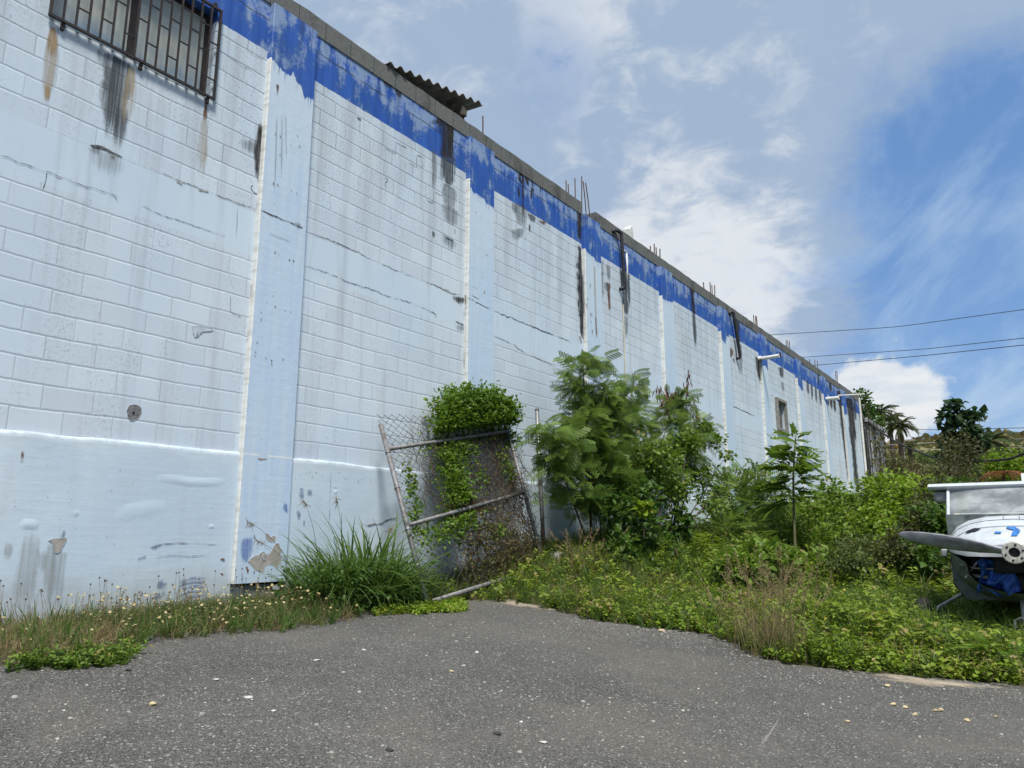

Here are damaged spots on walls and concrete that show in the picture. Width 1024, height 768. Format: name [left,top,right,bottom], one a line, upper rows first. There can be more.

water stain [105,56,129,133]
crack [1,155,118,200]
water stain [254,124,262,179]
water stain [434,118,455,184]
spalling [565,176,591,218]
crack [144,167,569,364]
water stain [576,212,584,351]
water stain [621,271,630,313]
spalling [126,404,142,421]
spalling [48,538,67,553]
peeling [220,533,282,598]